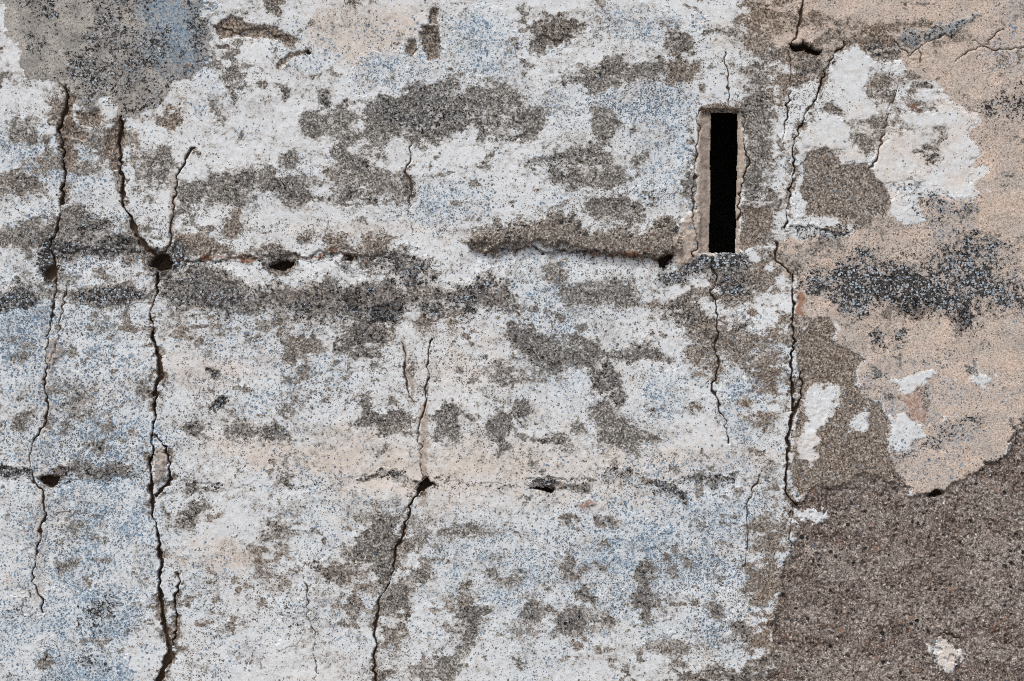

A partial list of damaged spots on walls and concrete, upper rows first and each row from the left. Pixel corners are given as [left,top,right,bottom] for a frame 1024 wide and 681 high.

crack [27,84,70,662]
crack [117,115,196,681]
crack [371,338,433,681]
crack [690,51,751,445]
crack [742,0,846,568]
spalling [660,0,1024,681]
crack [868,28,1024,170]